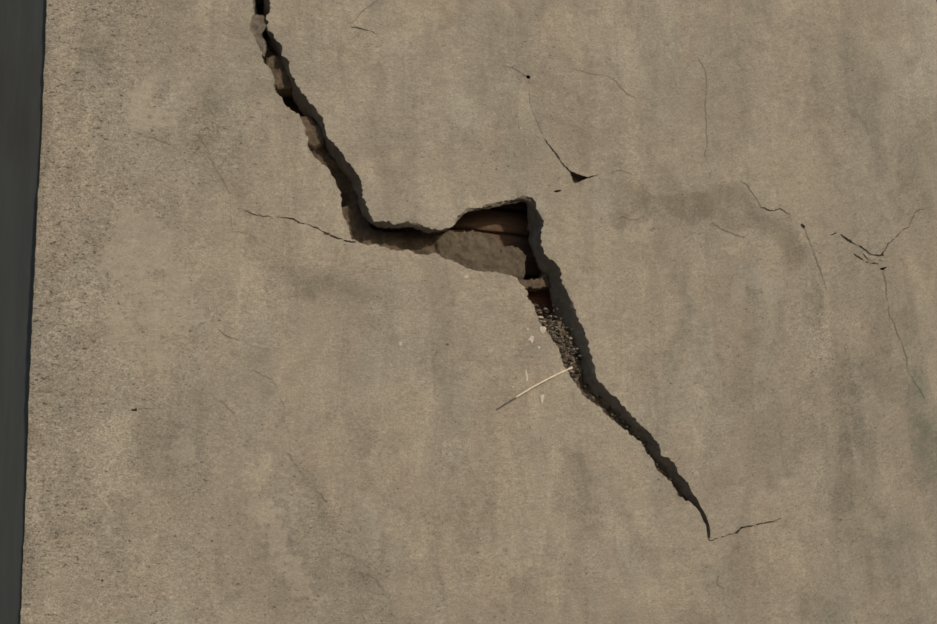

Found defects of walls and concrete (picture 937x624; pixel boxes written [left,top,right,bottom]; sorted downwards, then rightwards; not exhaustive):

crack [199,0,783,541]
crack [741,181,925,398]